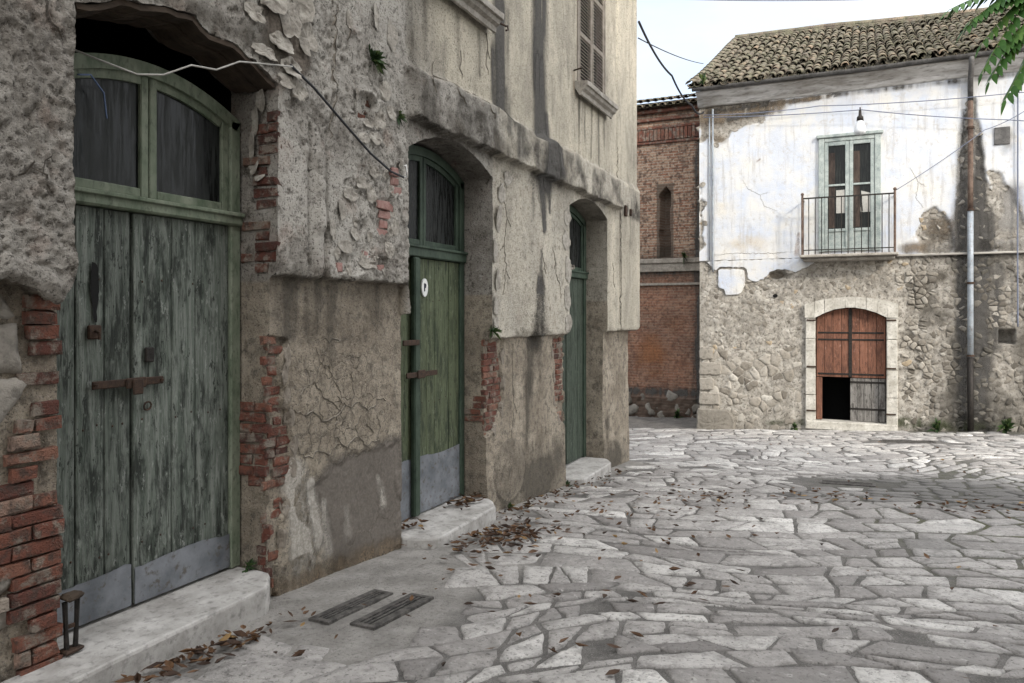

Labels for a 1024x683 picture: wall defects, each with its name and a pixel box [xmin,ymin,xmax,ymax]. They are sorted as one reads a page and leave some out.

spalling [0,294,65,676]
spalling [241,89,282,273]
spalling [239,336,299,588]
damp [270,462,402,597]
crack [294,337,395,483]
peeling [329,158,403,276]
spalling [464,171,512,438]
damp [492,0,521,157]
damp [533,0,565,233]
peeling [551,209,572,425]
peeling [706,258,814,295]
damp [904,109,1024,432]